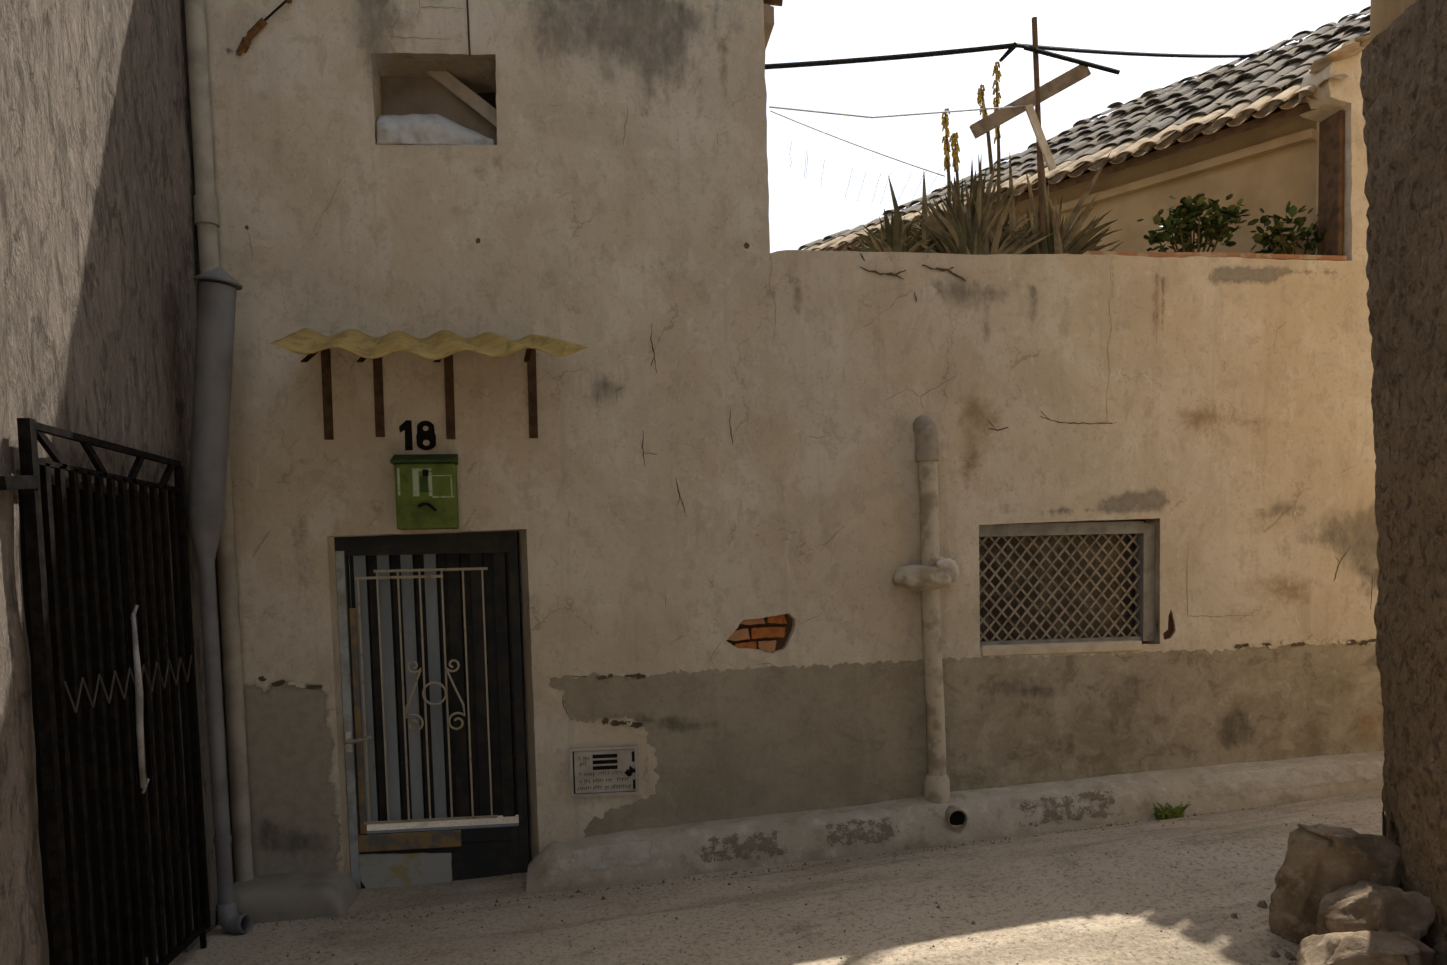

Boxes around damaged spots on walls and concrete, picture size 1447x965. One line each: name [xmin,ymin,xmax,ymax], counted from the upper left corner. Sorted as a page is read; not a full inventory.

water stain [544,0,692,74]
crack [860,253,966,302]
water stain [1328,517,1379,575]
spalling [726,613,800,661]
flaking render [258,676,332,692]
flaking render [596,672,646,680]
flaking render [602,717,643,729]
spalling [1020,790,1123,827]
spalling [698,831,786,863]
spalling [826,816,899,846]